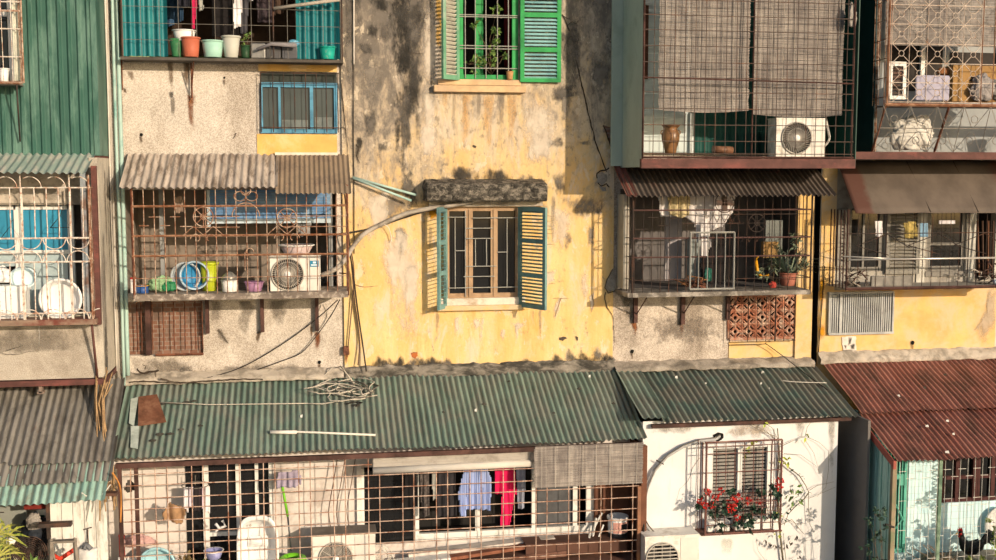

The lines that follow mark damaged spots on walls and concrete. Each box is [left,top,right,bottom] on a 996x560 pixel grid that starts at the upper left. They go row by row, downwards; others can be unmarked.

leakage [345,0,425,217]
leakage [440,167,534,180]
peeling [368,193,390,237]
peeling [384,232,419,327]
leakage [657,319,709,342]
leakage [374,357,452,367]
leakage [553,350,615,361]